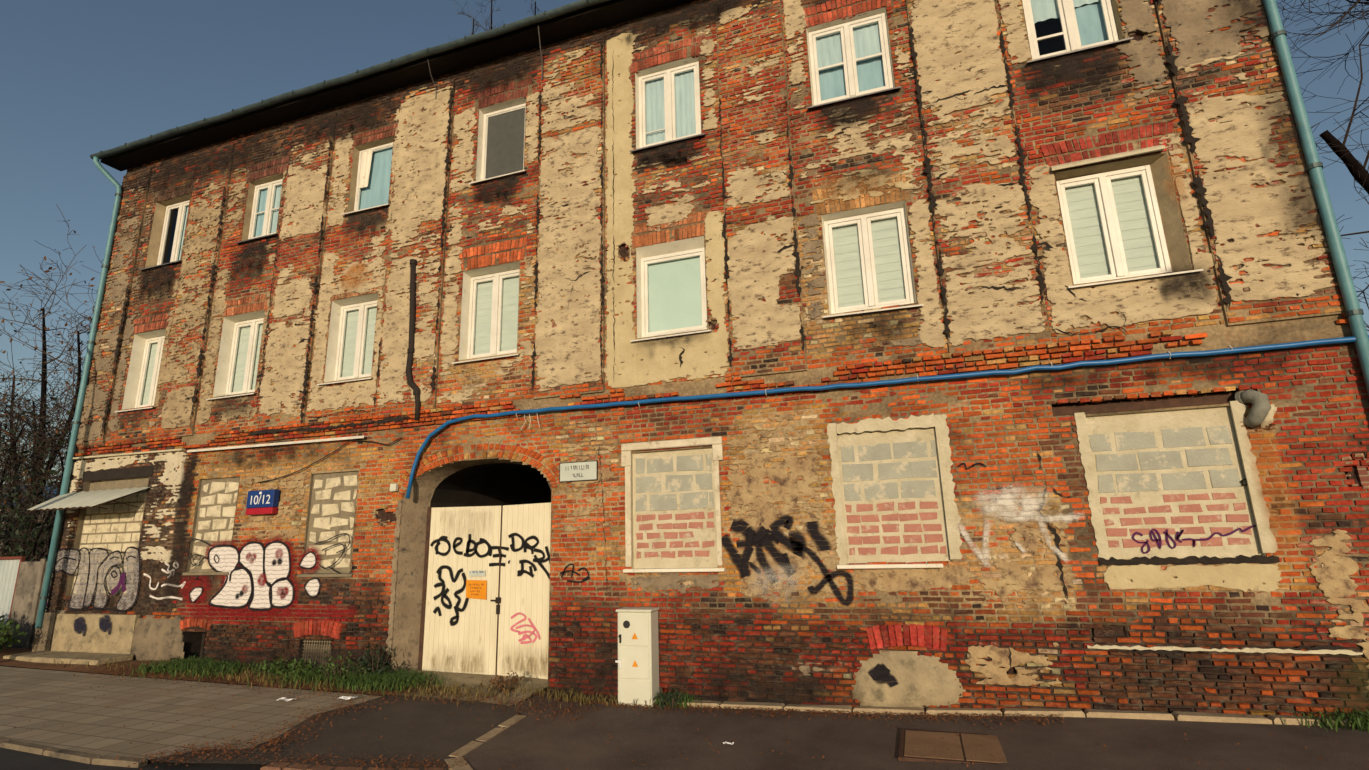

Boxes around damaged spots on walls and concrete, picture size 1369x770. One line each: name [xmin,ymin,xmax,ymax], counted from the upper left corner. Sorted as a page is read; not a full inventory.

flaking render [66,0,1334,563]
flaking render [965,642,1062,686]
flaking render [1309,529,1369,697]